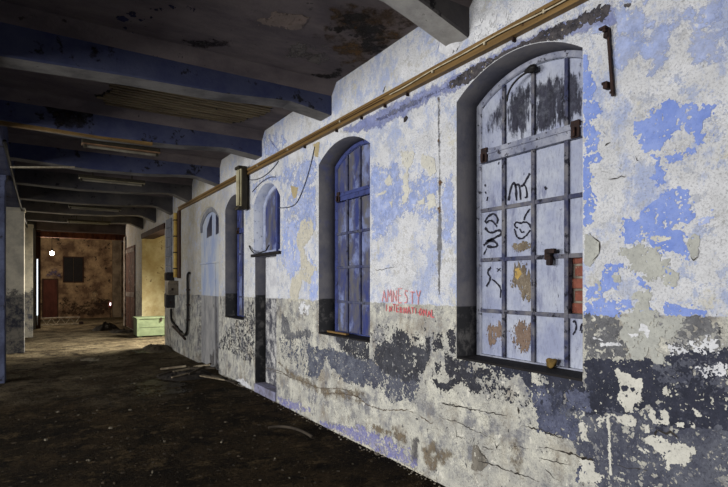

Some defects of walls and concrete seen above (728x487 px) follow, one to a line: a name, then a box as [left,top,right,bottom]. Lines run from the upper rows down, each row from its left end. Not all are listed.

leakage [286,4,413,79]
leakage [343,28,550,147]
leakage [561,7,616,36]
peeling [253,142,320,316]
peeling [277,54,728,487]
leakage [281,365,361,402]
crack [266,362,593,482]